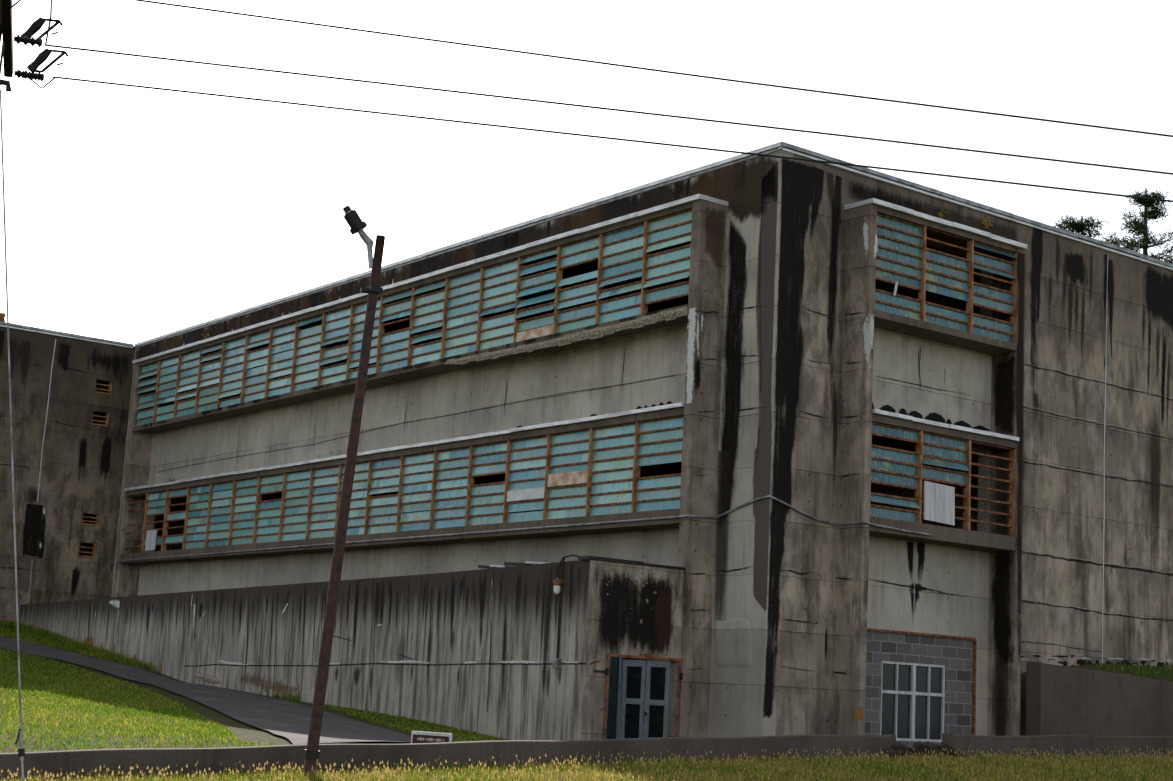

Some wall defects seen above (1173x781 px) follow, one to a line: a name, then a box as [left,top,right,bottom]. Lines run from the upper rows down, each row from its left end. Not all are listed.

damp [0,330,30,380]
damp [57,343,69,371]
damp [1143,266,1173,547]
damp [78,411,125,479]
damp [88,156,1114,736]
damp [71,567,80,594]